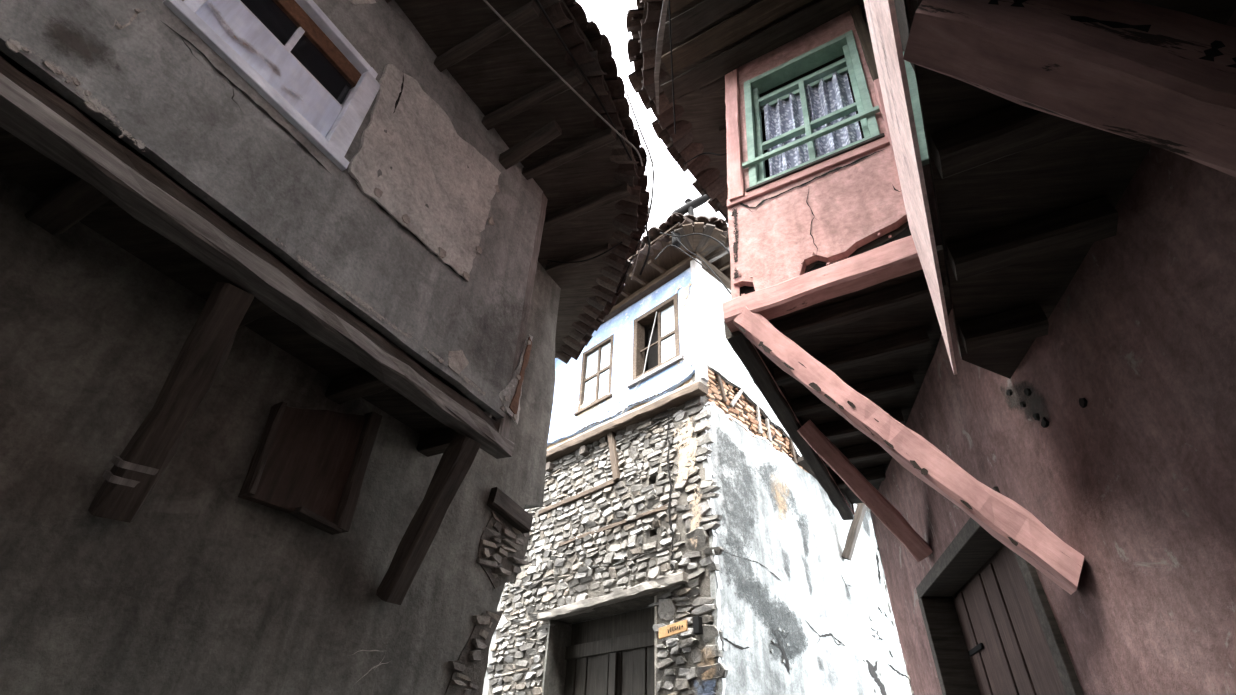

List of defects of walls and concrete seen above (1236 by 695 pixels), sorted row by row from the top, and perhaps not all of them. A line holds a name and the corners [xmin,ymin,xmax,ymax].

crack [730,149,884,256]
flaking render [874,226,911,249]
flaking render [276,238,533,425]
peeling [573,393,618,425]
flaking render [635,283,808,695]
flaking render [476,511,530,589]
damp [714,428,813,660]
flaking render [445,610,504,695]